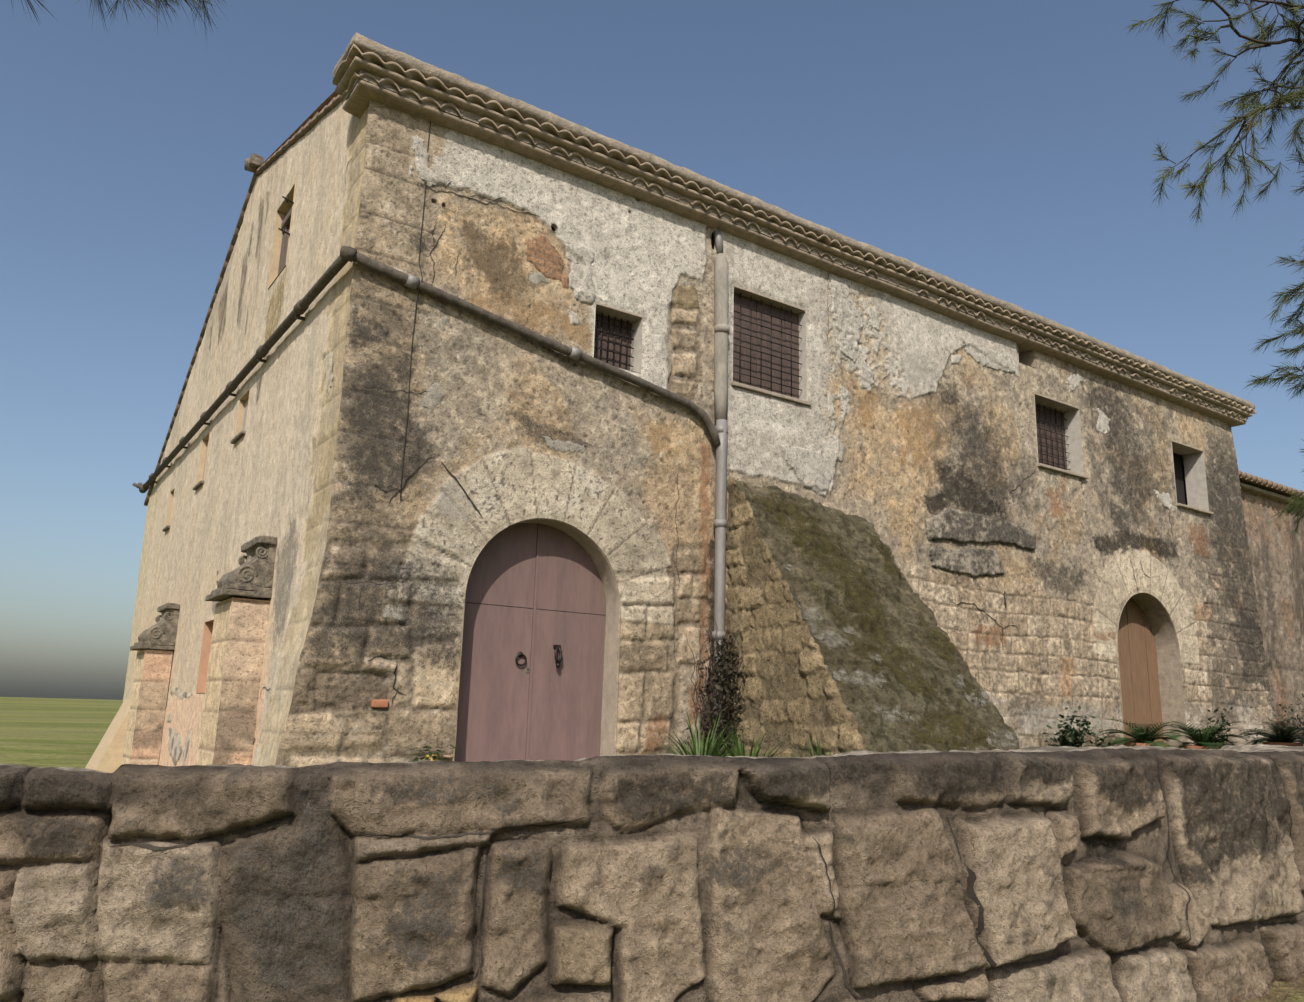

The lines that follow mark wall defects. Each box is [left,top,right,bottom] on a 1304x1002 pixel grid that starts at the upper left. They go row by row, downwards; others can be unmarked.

crack [415,182,539,217]
crack [430,224,459,283]
flaking render [829,276,882,417]
flaking render [950,339,1016,373]
crack [351,384,428,394]